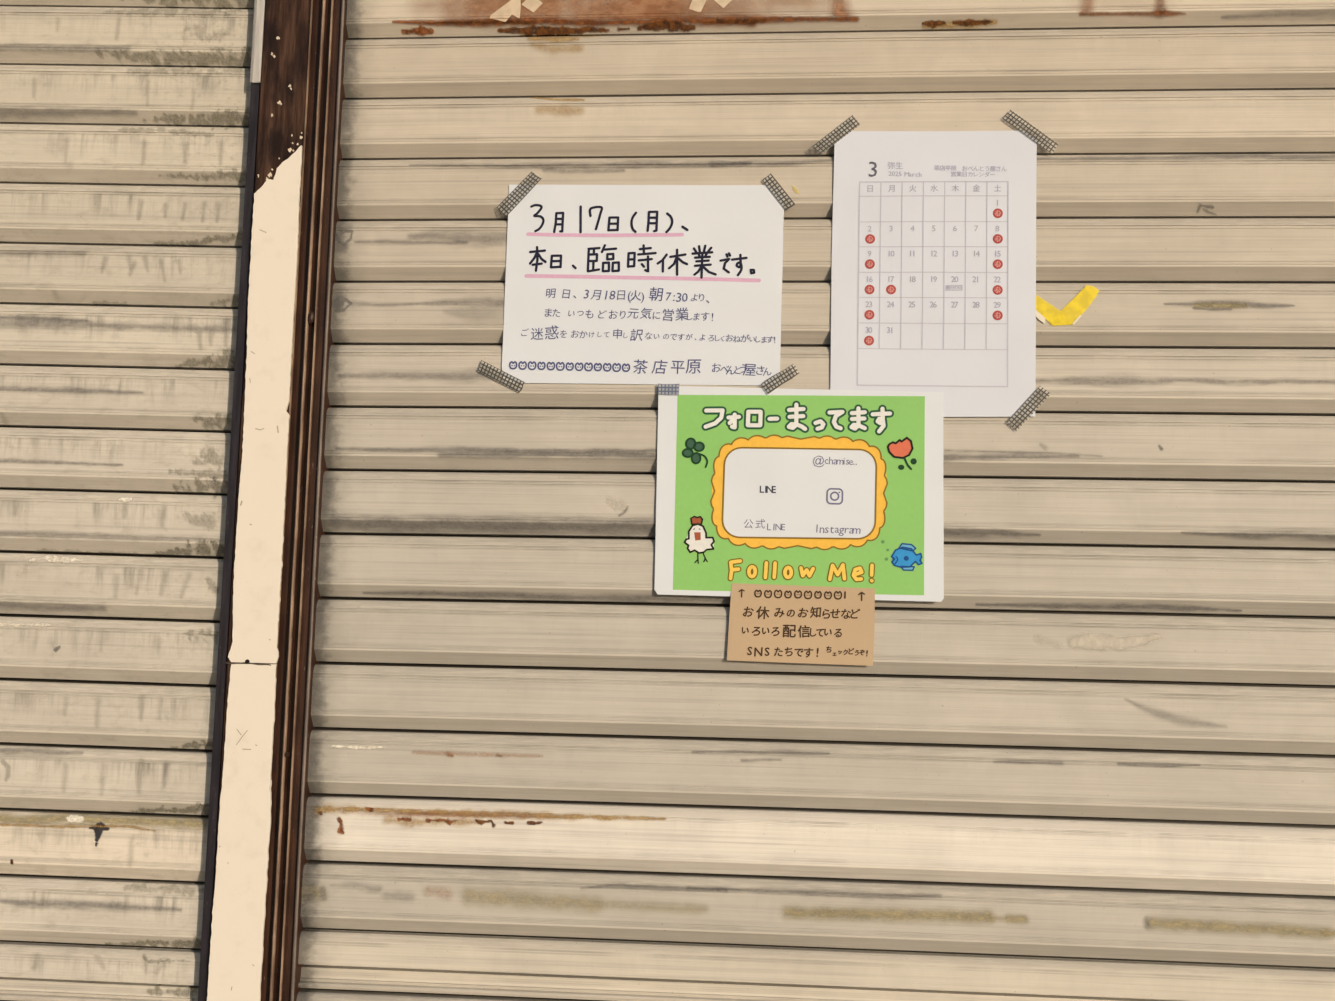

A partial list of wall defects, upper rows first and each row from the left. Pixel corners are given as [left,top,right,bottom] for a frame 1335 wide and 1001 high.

corrosion [392,0,859,42]
corrosion [922,19,997,28]
corrosion [1080,2,1183,16]
corrosion [315,806,666,834]